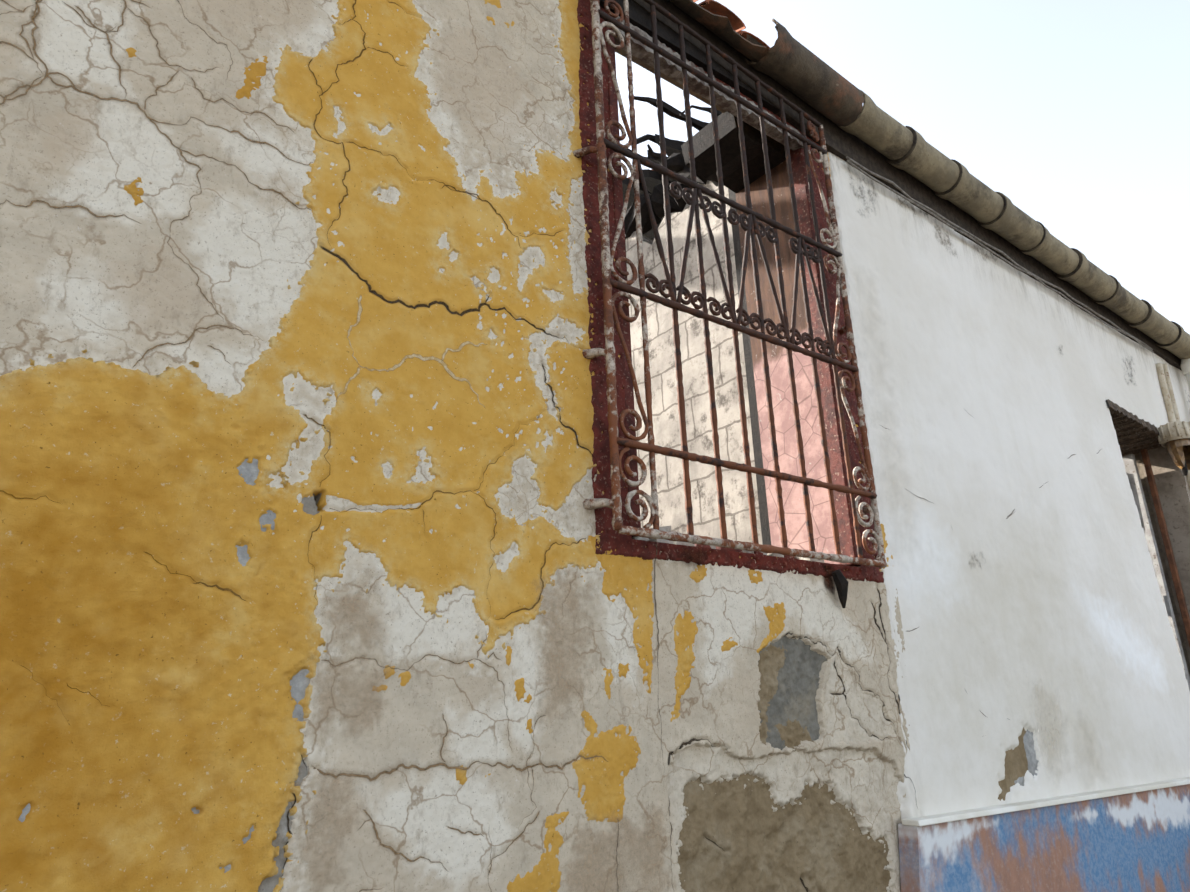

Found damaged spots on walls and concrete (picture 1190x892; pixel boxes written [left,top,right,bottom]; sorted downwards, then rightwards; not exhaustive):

peeling [0,0,352,398]
peeling [333,92,361,138]
peeling [368,124,397,145]
peeling [395,0,575,201]
crack [0,0,604,892]
peeling [235,177,910,892]
crack [654,543,721,770]
rust [823,565,835,593]
crack [785,589,917,745]
spalling [19,803,31,822]
crack [613,823,621,888]
peeling [998,727,1039,801]